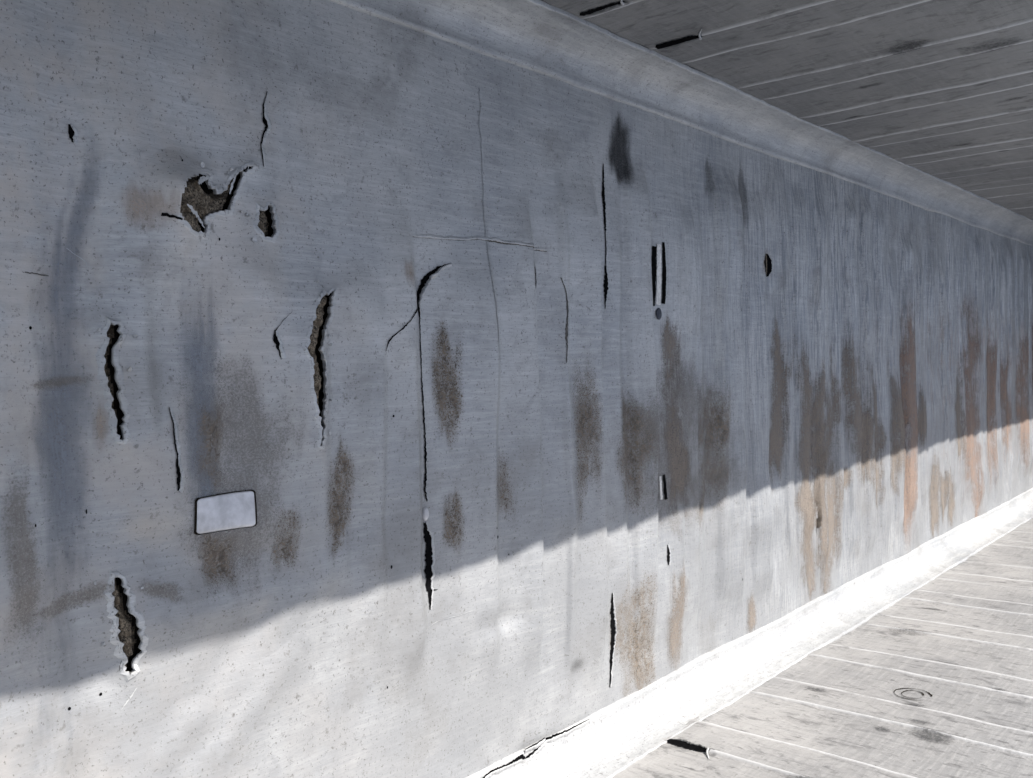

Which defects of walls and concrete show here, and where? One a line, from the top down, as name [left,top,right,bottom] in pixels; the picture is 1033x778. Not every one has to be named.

crack [261,92,272,167]
crack [601,164,609,309]
crack [169,406,185,493]
crack [386,234,569,610]
corrosion [572,356,604,517]
corrosion [617,318,734,519]
corrosion [769,317,955,600]
corrosion [955,298,1033,517]
crack [609,593,617,687]
corrosion [610,570,656,696]
corrosion [669,572,686,662]
crack [483,719,591,778]